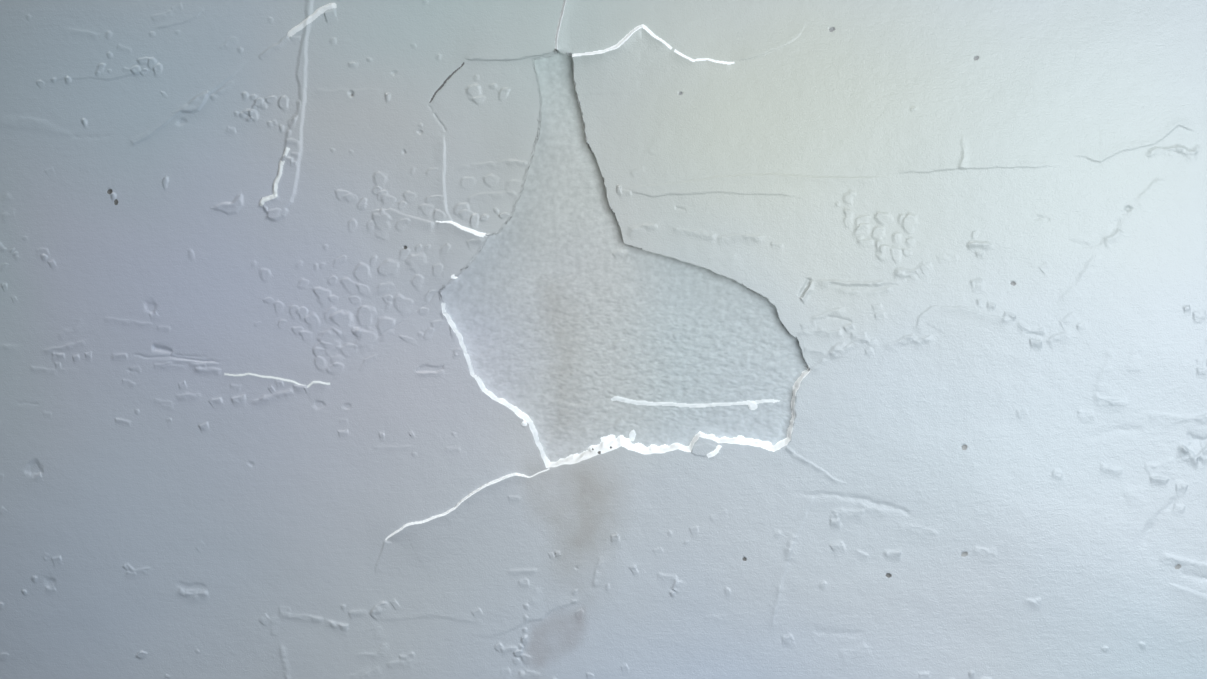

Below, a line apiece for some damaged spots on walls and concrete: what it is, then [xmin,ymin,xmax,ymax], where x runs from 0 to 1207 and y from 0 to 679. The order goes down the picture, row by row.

crack [371,0,807,237]
peeling [438,49,811,468]
crack [1070,124,1203,165]